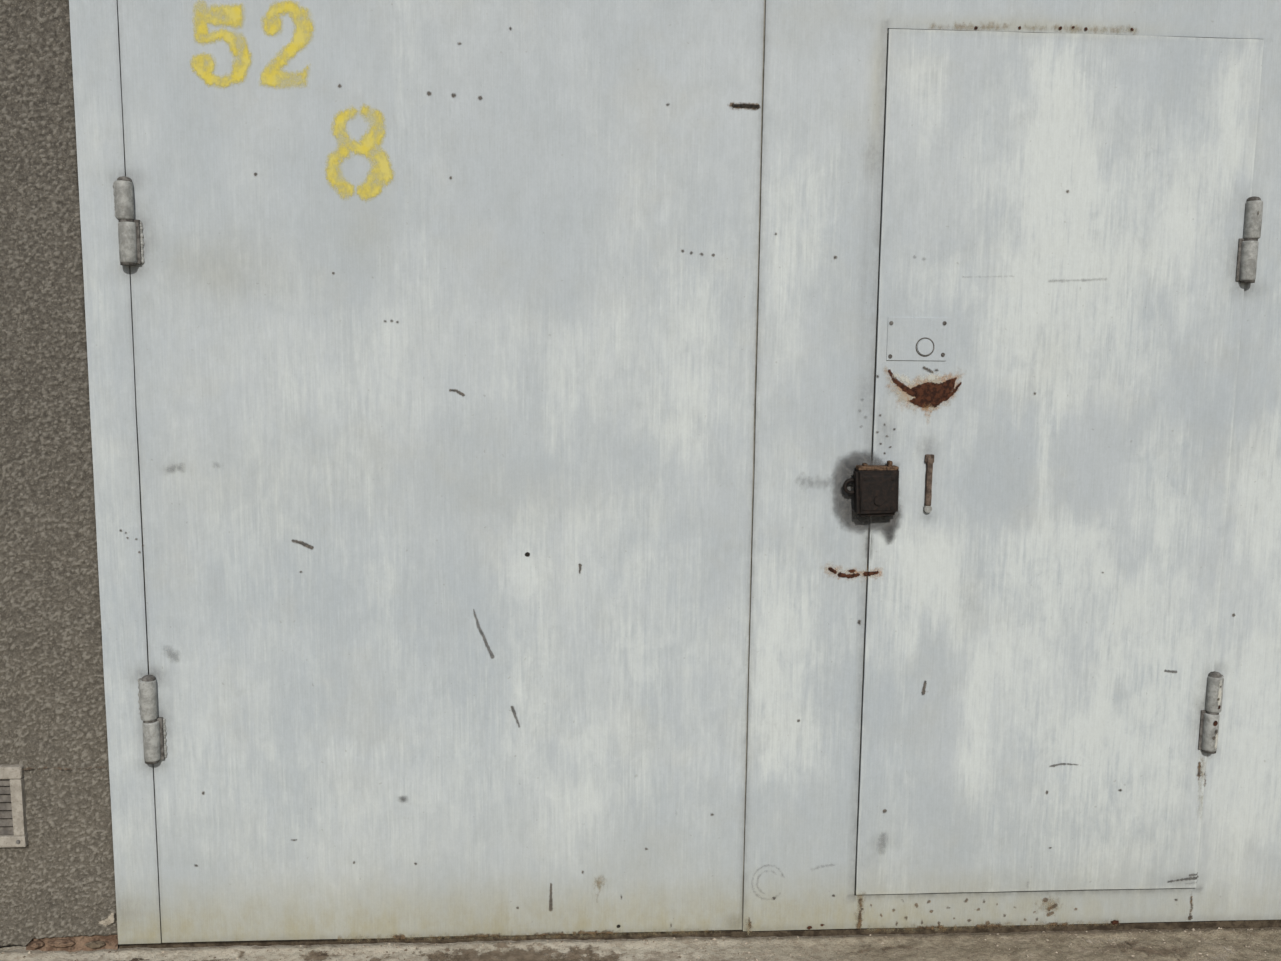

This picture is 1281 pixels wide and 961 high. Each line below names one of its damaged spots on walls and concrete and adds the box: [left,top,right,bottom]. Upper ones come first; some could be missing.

corrosion [888,366,962,408]
corrosion [828,567,879,578]